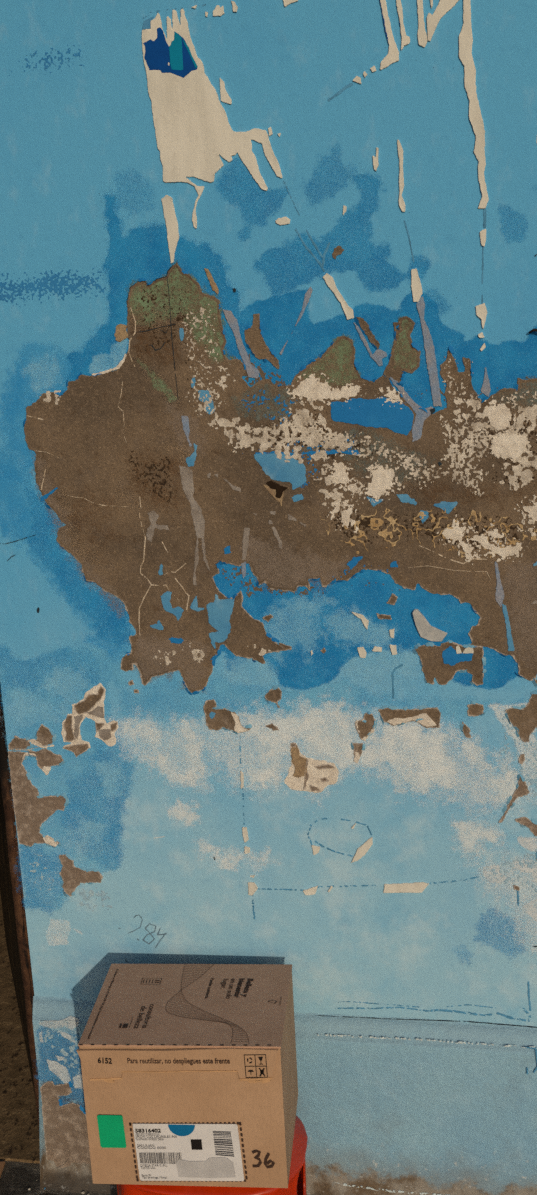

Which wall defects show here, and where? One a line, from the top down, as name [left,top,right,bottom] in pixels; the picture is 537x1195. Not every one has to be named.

flaking render [0,189,537,922]
flaking render [33,1016,91,1168]